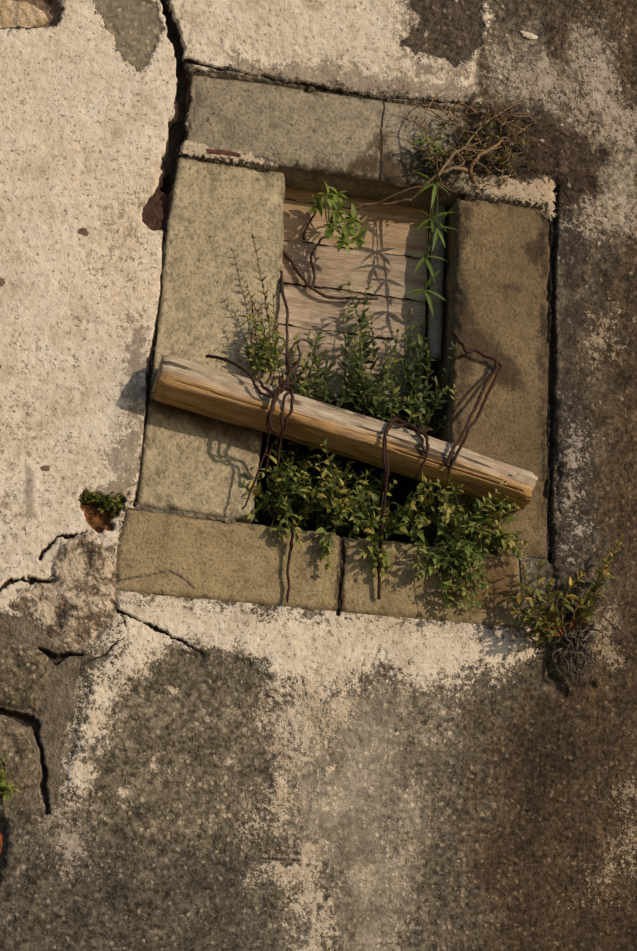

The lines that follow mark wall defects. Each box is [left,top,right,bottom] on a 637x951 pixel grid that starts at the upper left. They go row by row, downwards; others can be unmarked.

flaking render [0,0,62,29]
crack [160,0,469,194]
flaking render [400,0,486,66]
crack [133,233,165,508]
leakage [327,28,637,695]
crack [0,532,86,591]
flaking render [0,490,132,879]
crack [38,607,197,666]
crack [0,708,50,815]
leakage [35,791,103,884]
leakage [237,660,370,951]
leakage [558,762,637,909]